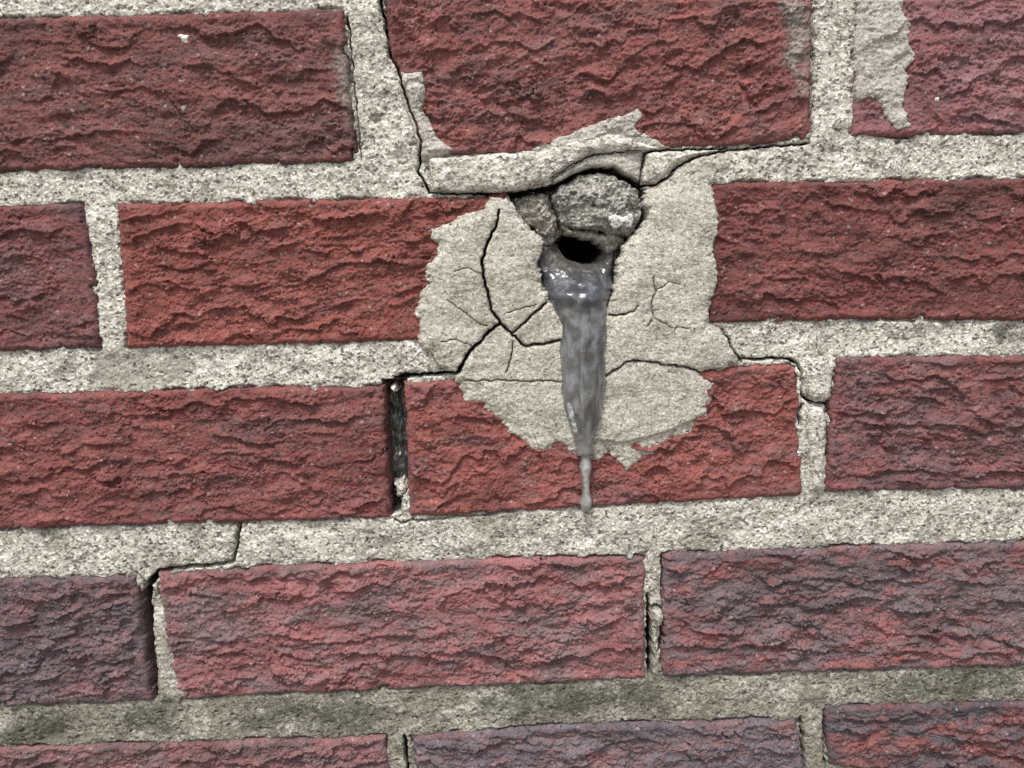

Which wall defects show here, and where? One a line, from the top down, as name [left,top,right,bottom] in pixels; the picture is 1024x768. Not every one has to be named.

crack [380,0,806,379]
peeling [640,150,724,184]
peeling [460,302,563,381]
peeling [590,416,701,471]
crack [148,568,161,594]
crack [645,591,662,669]